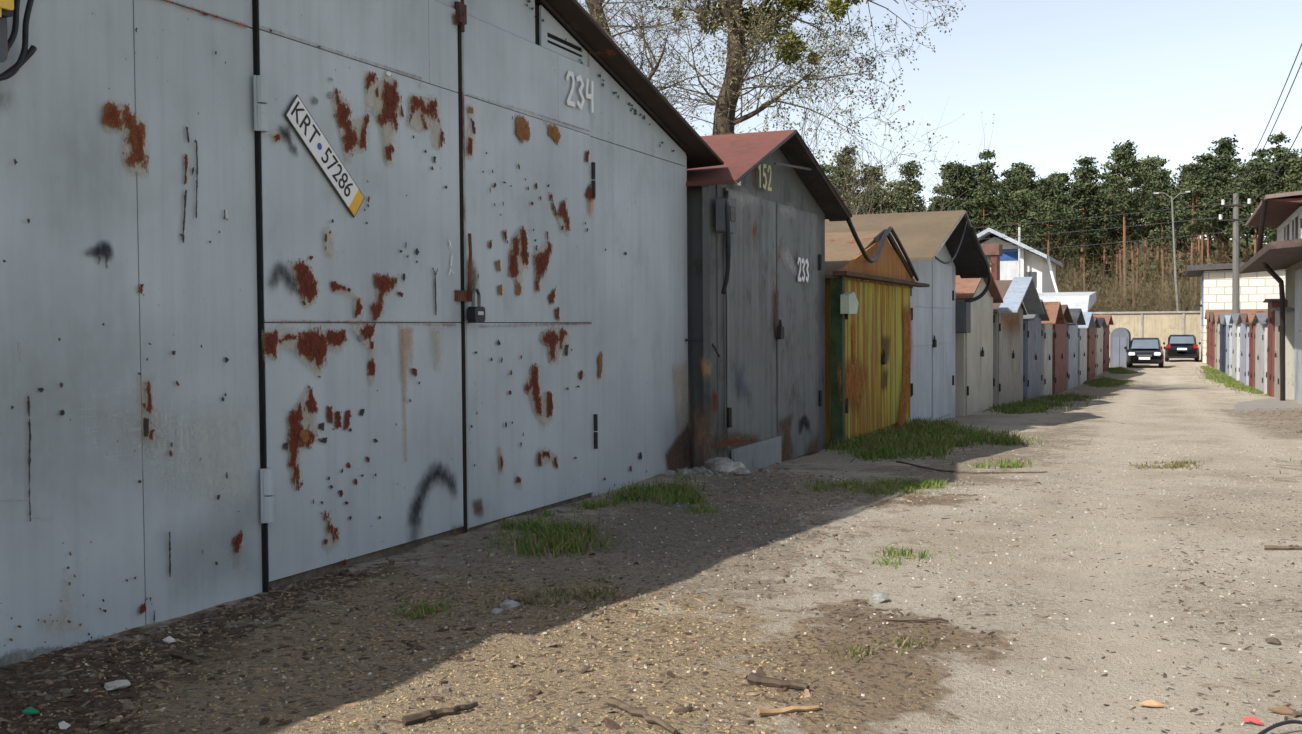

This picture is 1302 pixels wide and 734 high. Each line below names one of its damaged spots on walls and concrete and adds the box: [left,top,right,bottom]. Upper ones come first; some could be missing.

rust [102,88,149,174]
rust [334,71,445,170]
rust [512,115,530,143]
rust [548,119,581,145]
rust [586,185,594,213]
rust [262,255,404,376]
rust [489,192,603,418]
rust [283,385,365,496]
rust [666,391,758,471]